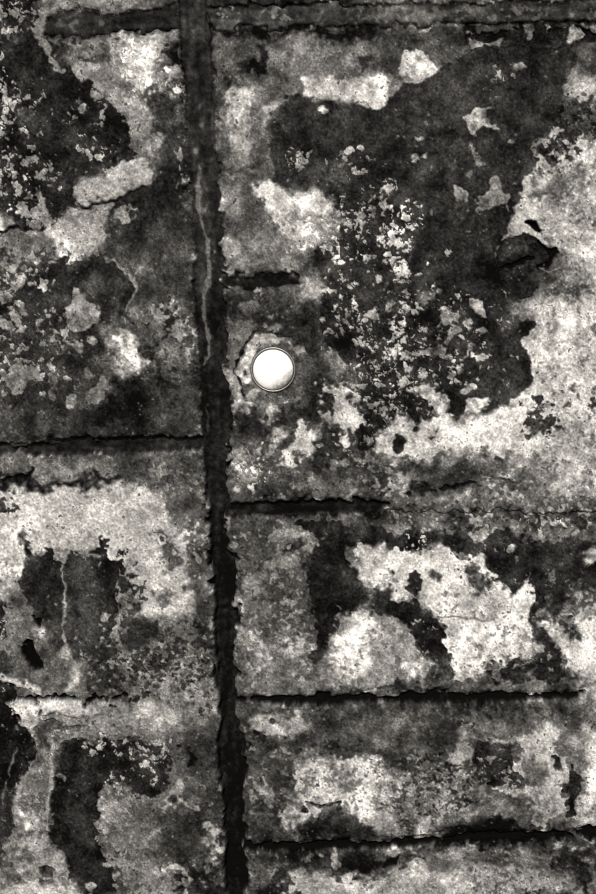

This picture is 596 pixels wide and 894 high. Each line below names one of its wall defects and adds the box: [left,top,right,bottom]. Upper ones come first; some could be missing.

damp [300,73,390,110]
damp [398,49,439,80]
efflorescence [251,180,345,259]
peeling [234,20,596,467]
damp [314,382,366,449]
damp [373,383,564,466]
damp [0,673,42,696]
damp [316,606,438,693]
damp [353,541,596,683]